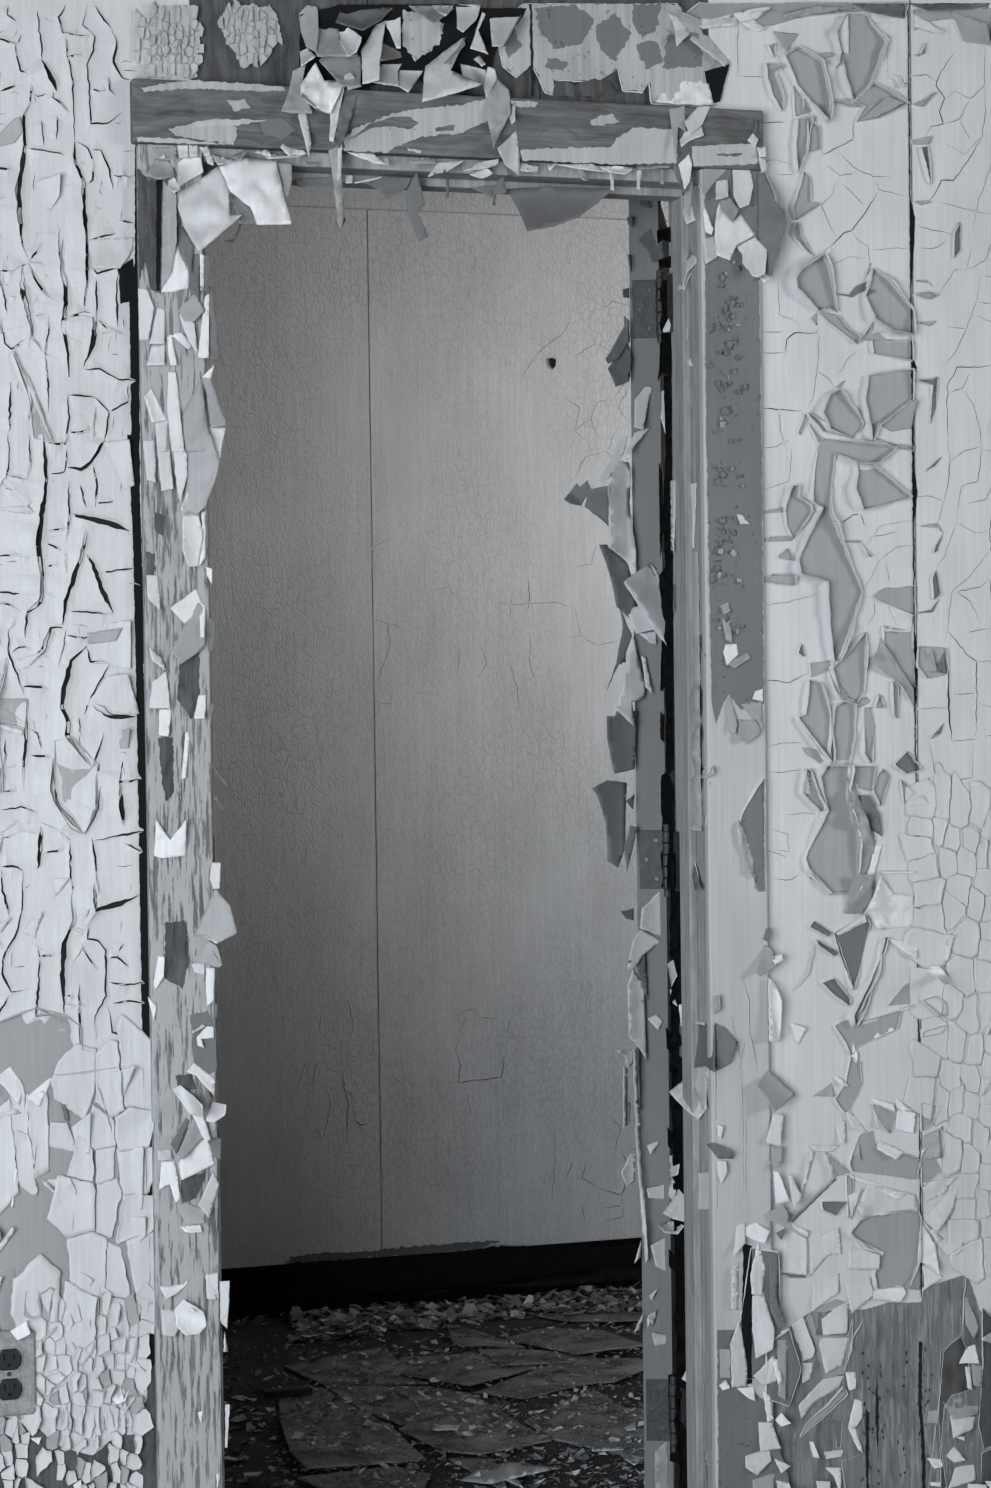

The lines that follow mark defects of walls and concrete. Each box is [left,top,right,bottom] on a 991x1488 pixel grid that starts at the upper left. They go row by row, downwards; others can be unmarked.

peeling [45,735,99,837]
crack [0,4,145,1056]
peeling [87,237,133,269]
peeling [105,439,134,490]
peeling [87,551,216,802]
peeling [154,820,187,858]
peeling [143,365,226,584]
peeling [133,0,991,365]
peeling [420,280,737,1488]
peeling [689,133,991,1488]
crack [761,47,991,785]
peeling [0,862,237,1488]